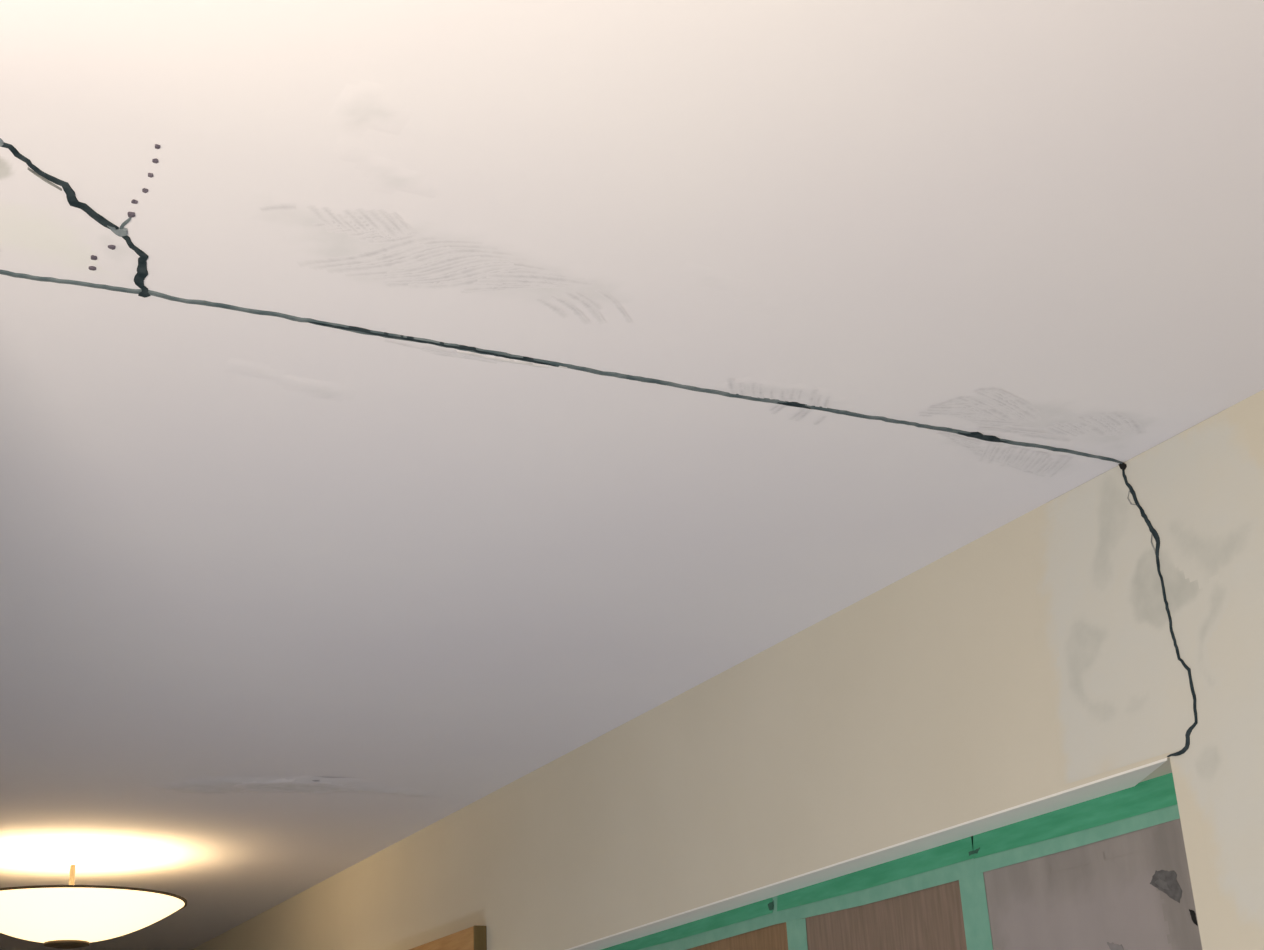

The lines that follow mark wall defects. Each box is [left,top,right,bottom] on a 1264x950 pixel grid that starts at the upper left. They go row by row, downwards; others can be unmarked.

crack [0,138,1198,757]